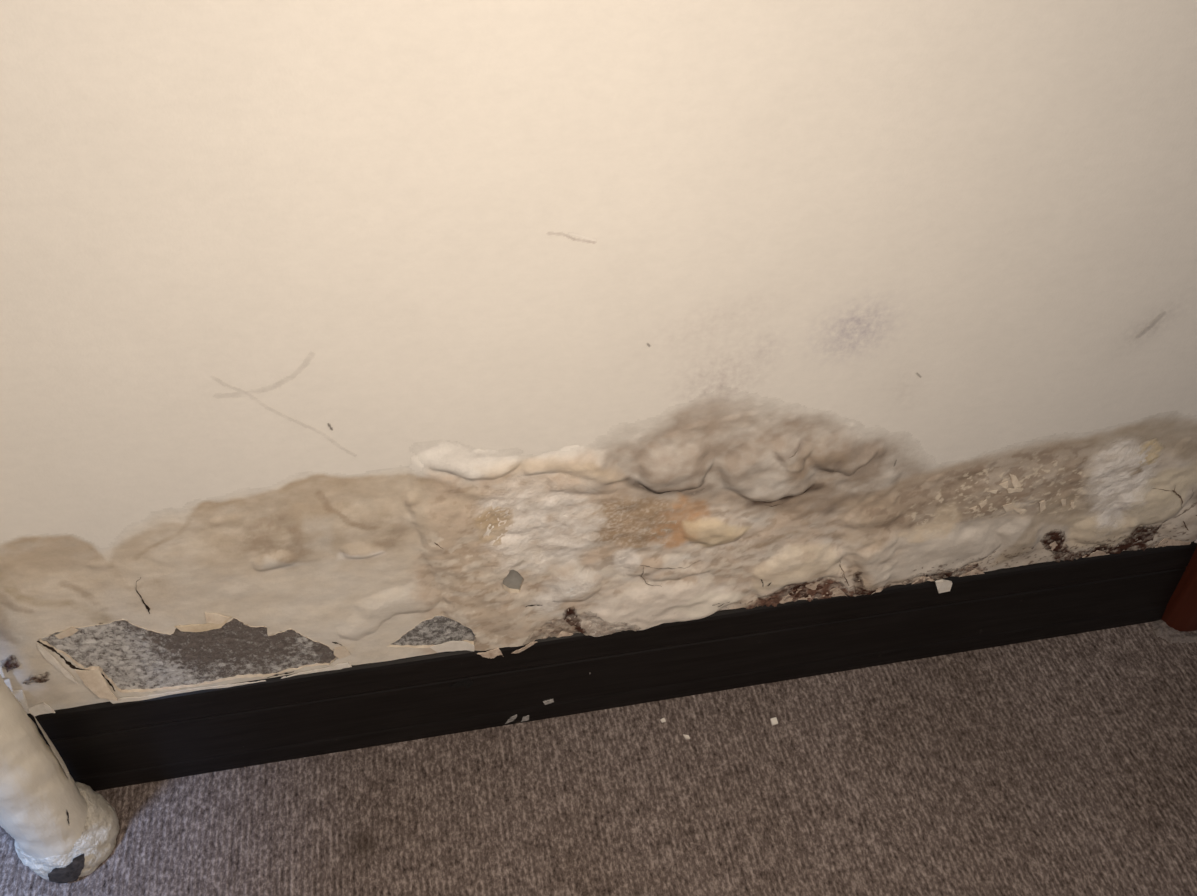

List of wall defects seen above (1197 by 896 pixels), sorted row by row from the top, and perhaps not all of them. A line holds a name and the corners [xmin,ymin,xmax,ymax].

leakage [0,384,1197,713]
flaking render [1039,524,1191,563]
flaking render [743,562,987,609]
peeling [387,605,641,659]
peeling [0,613,352,717]